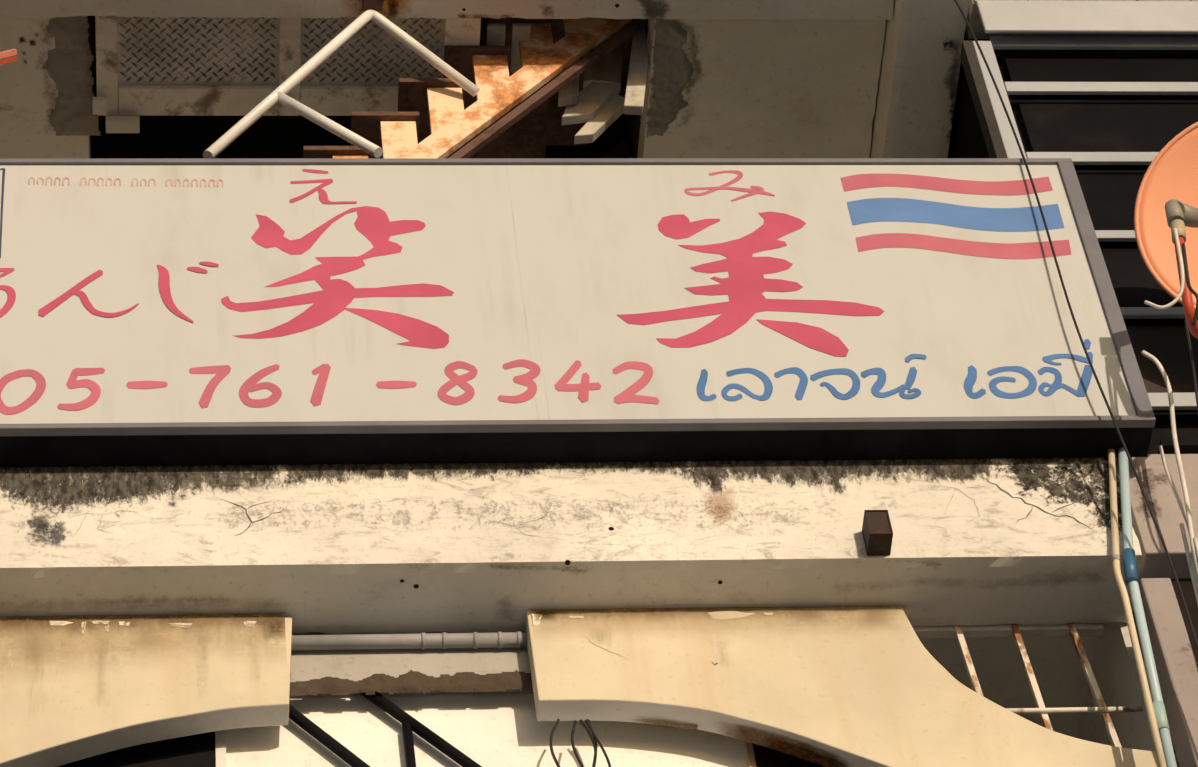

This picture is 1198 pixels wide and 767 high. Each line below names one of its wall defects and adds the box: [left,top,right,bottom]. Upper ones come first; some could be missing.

corrosion [377,0,406,18]
spalling [43,16,100,136]
spalling [646,18,693,137]
leakage [0,457,1133,548]
crack [941,477,1092,530]
spalling [290,670,533,696]